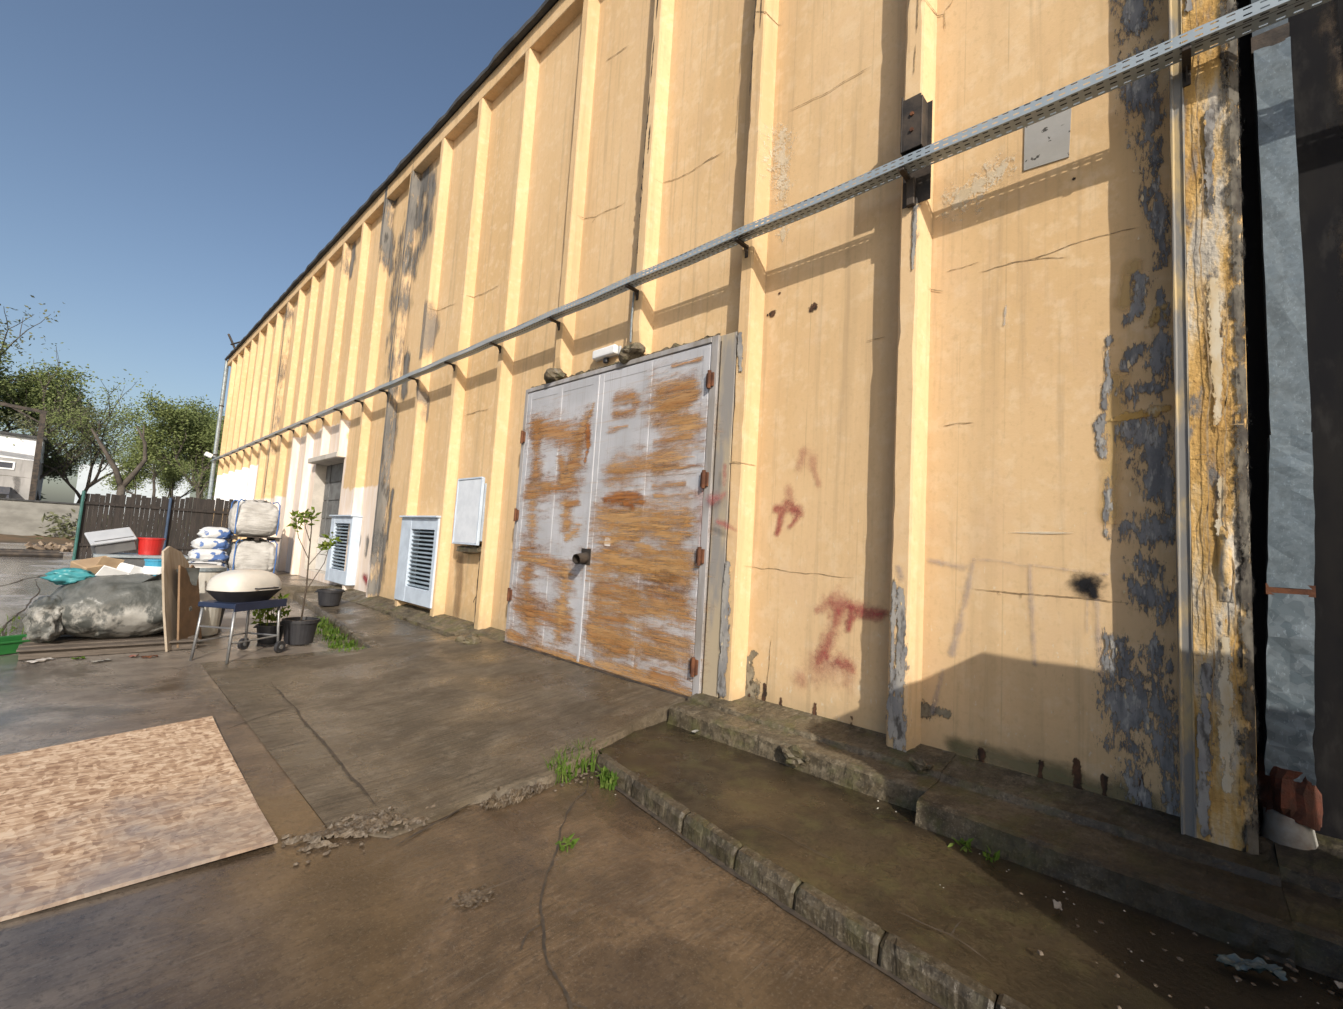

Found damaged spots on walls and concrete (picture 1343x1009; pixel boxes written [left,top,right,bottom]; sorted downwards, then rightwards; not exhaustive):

damp [347,164,439,596]
rust [506,356,704,696]
peeling [886,578,952,752]
peeling [1093,0,1238,837]
damp [1218,0,1269,855]
damp [1288,0,1343,840]
crack [521,772,591,1009]